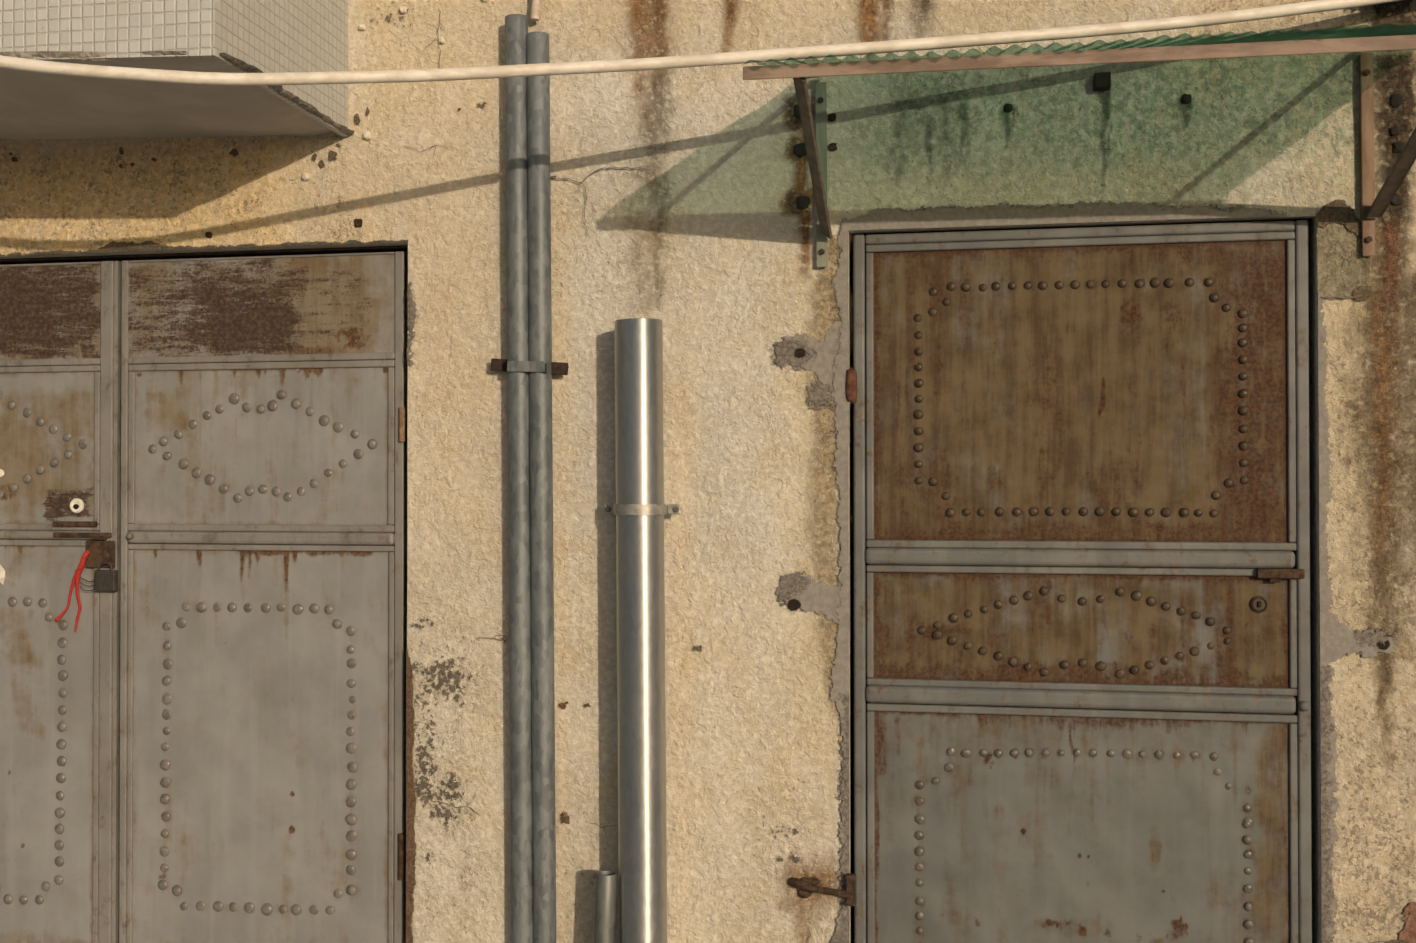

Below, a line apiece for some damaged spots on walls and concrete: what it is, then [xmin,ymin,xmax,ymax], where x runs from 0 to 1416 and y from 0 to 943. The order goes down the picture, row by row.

corrosion [633,0,665,71]
corrosion [862,0,890,42]
crack [550,166,649,237]
corrosion [781,100,816,251]
corrosion [1354,216,1416,741]
flaking render [769,200,1290,943]
peeling [407,656,477,827]
flaking render [1375,902,1416,943]